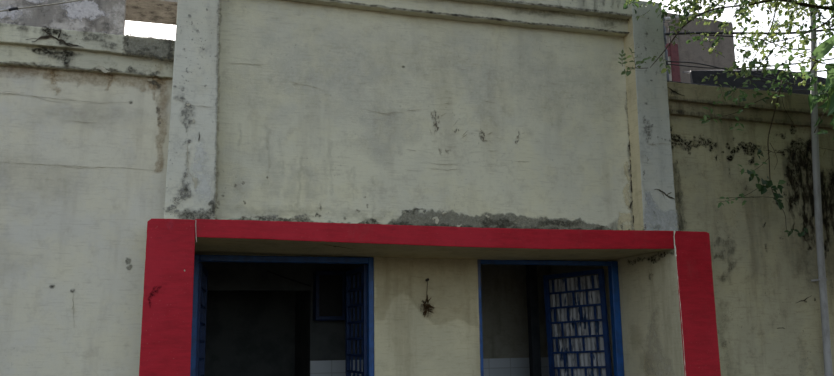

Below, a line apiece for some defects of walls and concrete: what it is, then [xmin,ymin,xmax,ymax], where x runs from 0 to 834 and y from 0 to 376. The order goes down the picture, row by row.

crack [26,29,84,48]
leakage [670,127,763,174]
flaking render [166,173,218,220]
flaking render [358,208,611,230]
leakage [775,126,834,257]